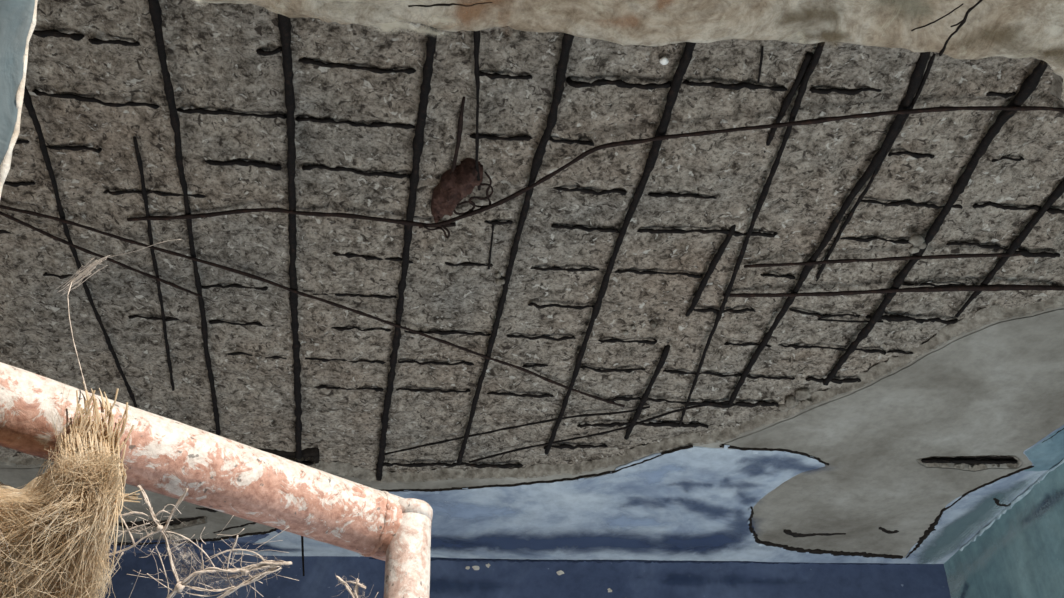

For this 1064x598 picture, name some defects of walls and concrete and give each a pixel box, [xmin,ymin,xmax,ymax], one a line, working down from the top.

spalling [0,0,1064,245]
crack [911,0,983,56]
spalling [0,110,1064,494]
peeling [108,484,281,547]
peeling [720,309,1064,559]